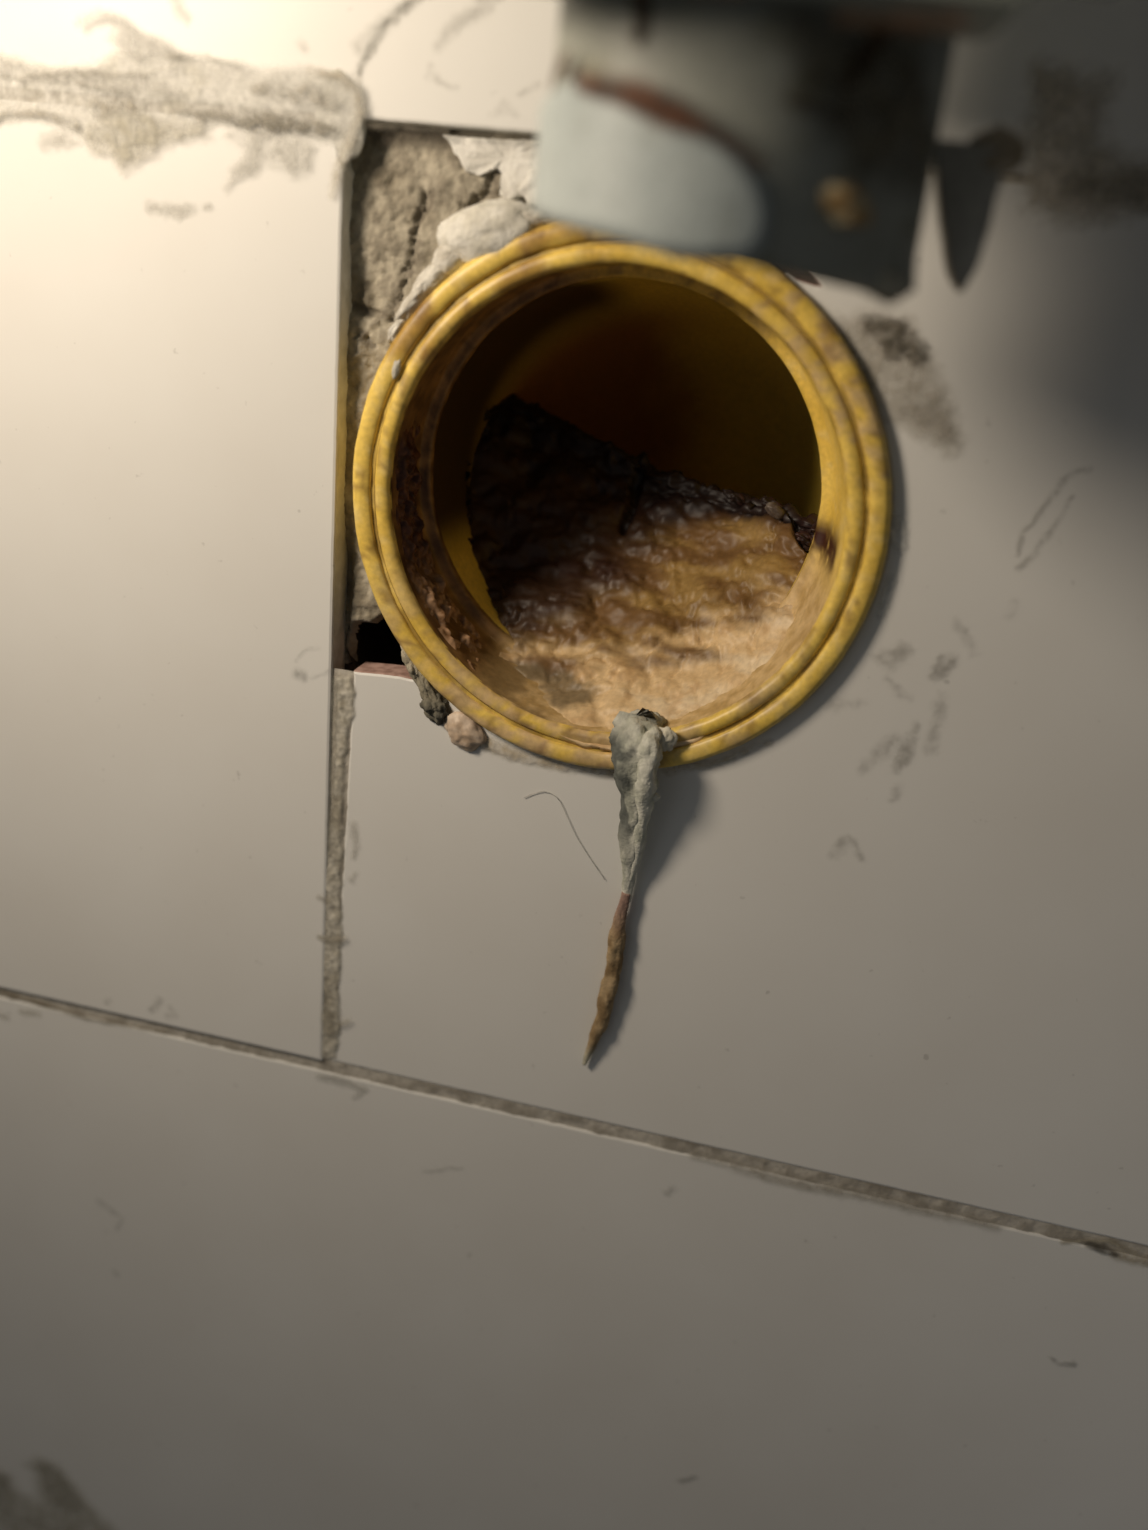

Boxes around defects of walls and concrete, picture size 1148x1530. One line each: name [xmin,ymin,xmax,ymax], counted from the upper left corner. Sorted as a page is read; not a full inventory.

spalling [344,122,537,668]